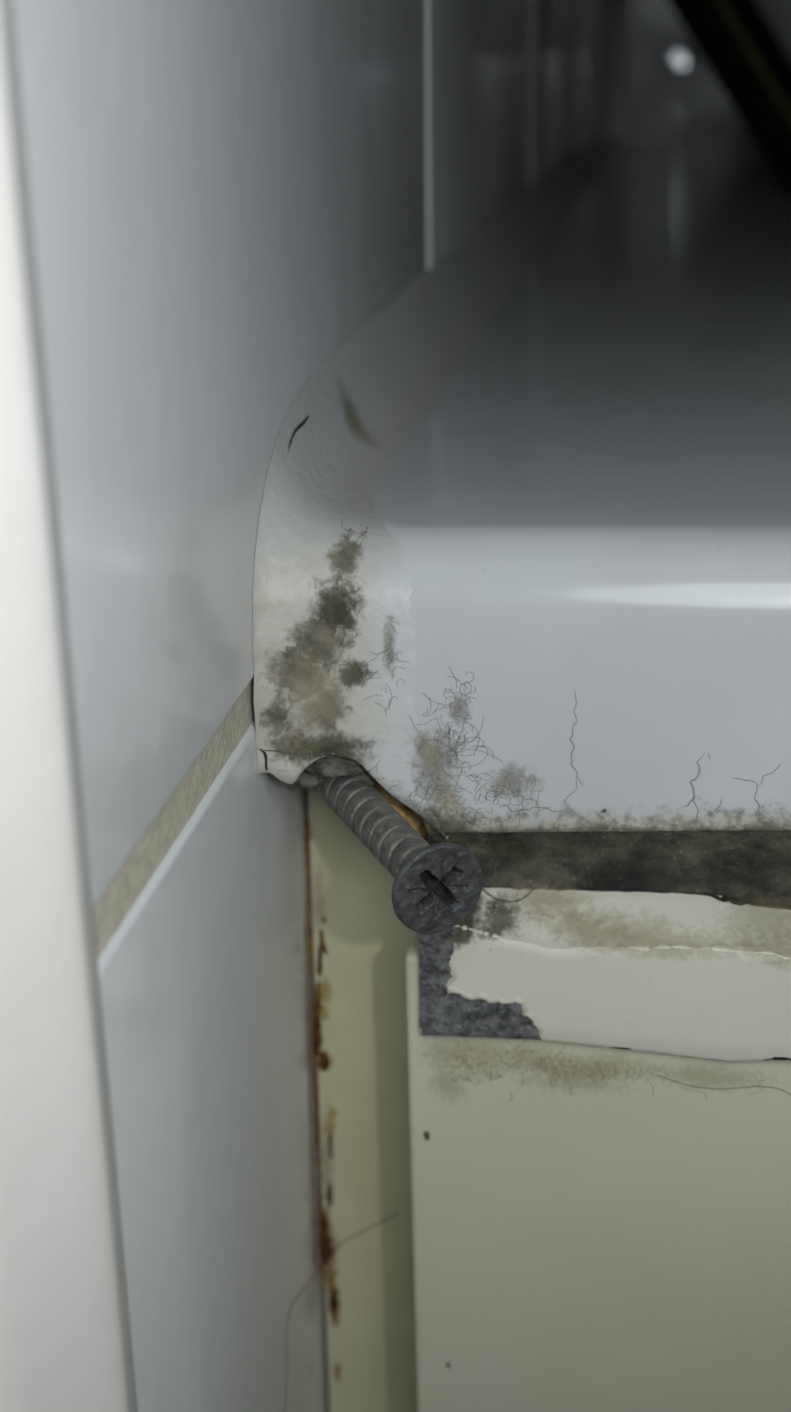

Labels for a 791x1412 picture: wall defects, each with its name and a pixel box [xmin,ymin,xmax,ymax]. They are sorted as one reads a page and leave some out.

damp [262,527,377,761]
corrosion [305,820,338,1324]
peeling [418,928,544,1040]